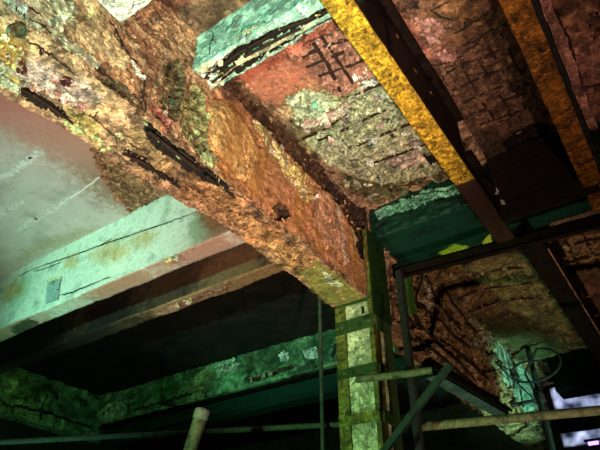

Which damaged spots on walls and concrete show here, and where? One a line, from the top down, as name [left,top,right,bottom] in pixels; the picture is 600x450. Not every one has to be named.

spalling [6,0,30,40]
peeling [46,0,78,44]
rust [239,62,317,101]
spalling [0,60,167,214]
spalling [98,0,258,233]
spalling [201,7,460,260]
crack [18,212,195,277]
rust [349,224,362,285]
crack [61,277,109,295]
flaking render [154,284,227,316]
spalling [408,263,541,390]
crack [2,392,93,429]